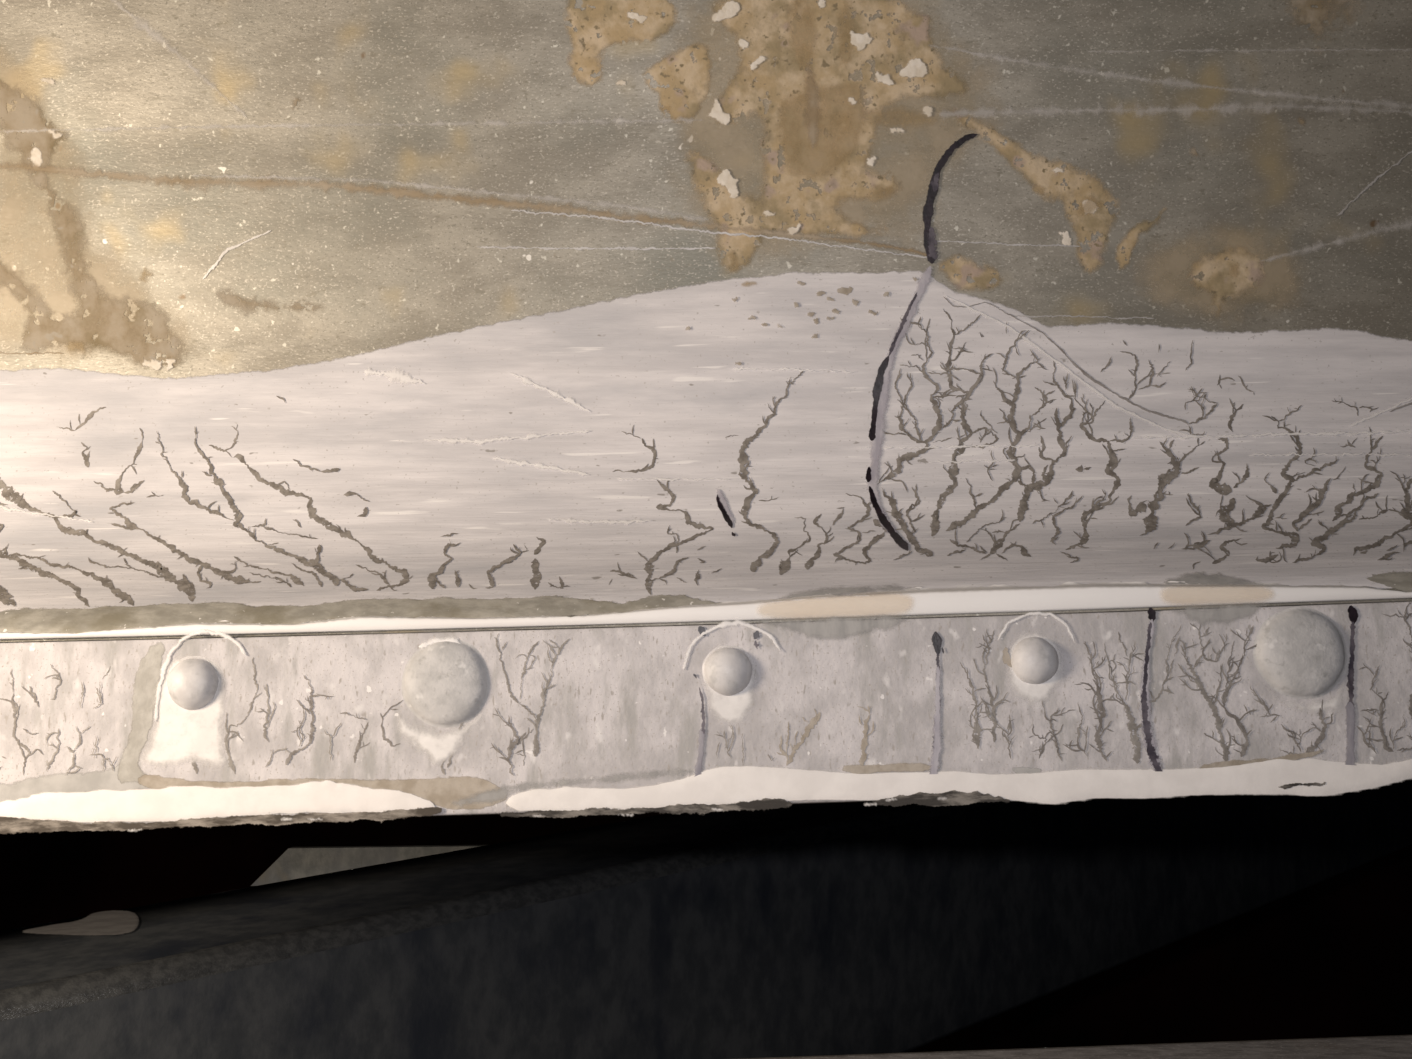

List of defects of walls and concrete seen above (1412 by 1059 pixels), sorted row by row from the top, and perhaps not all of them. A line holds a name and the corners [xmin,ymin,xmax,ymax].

leakage [0,81,182,370]
peeling [794,281,878,338]
crack [0,407,569,607]
crack [609,309,1412,595]
crack [0,664,117,776]
crack [192,658,403,774]
crack [441,635,569,776]
crack [714,709,821,766]
crack [857,706,875,765]
crack [960,601,1412,764]